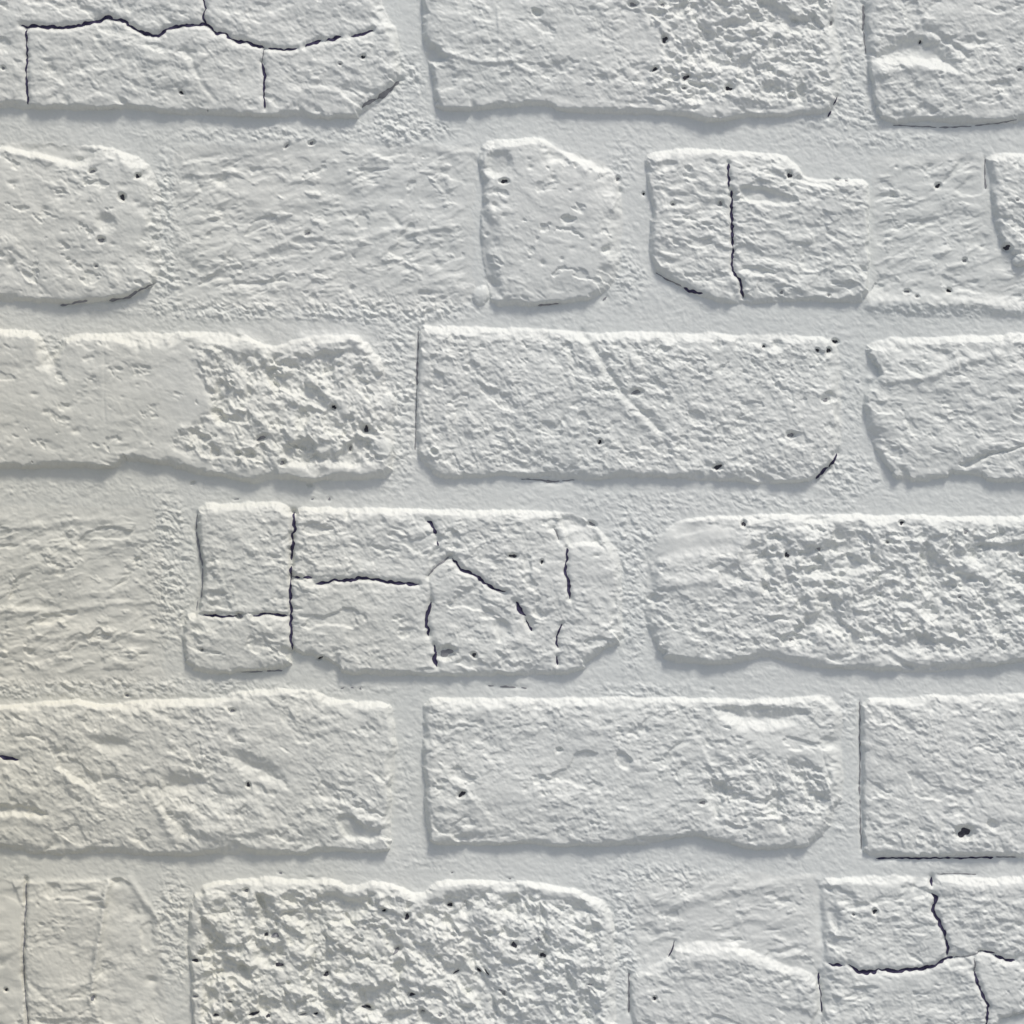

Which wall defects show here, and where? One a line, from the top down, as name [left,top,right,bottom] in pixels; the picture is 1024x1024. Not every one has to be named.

crack [21,0,373,108]
crack [362,81,399,108]
crack [727,164,744,298]
crack [204,512,562,666]
crack [554,529,571,598]
crack [817,877,1014,1024]